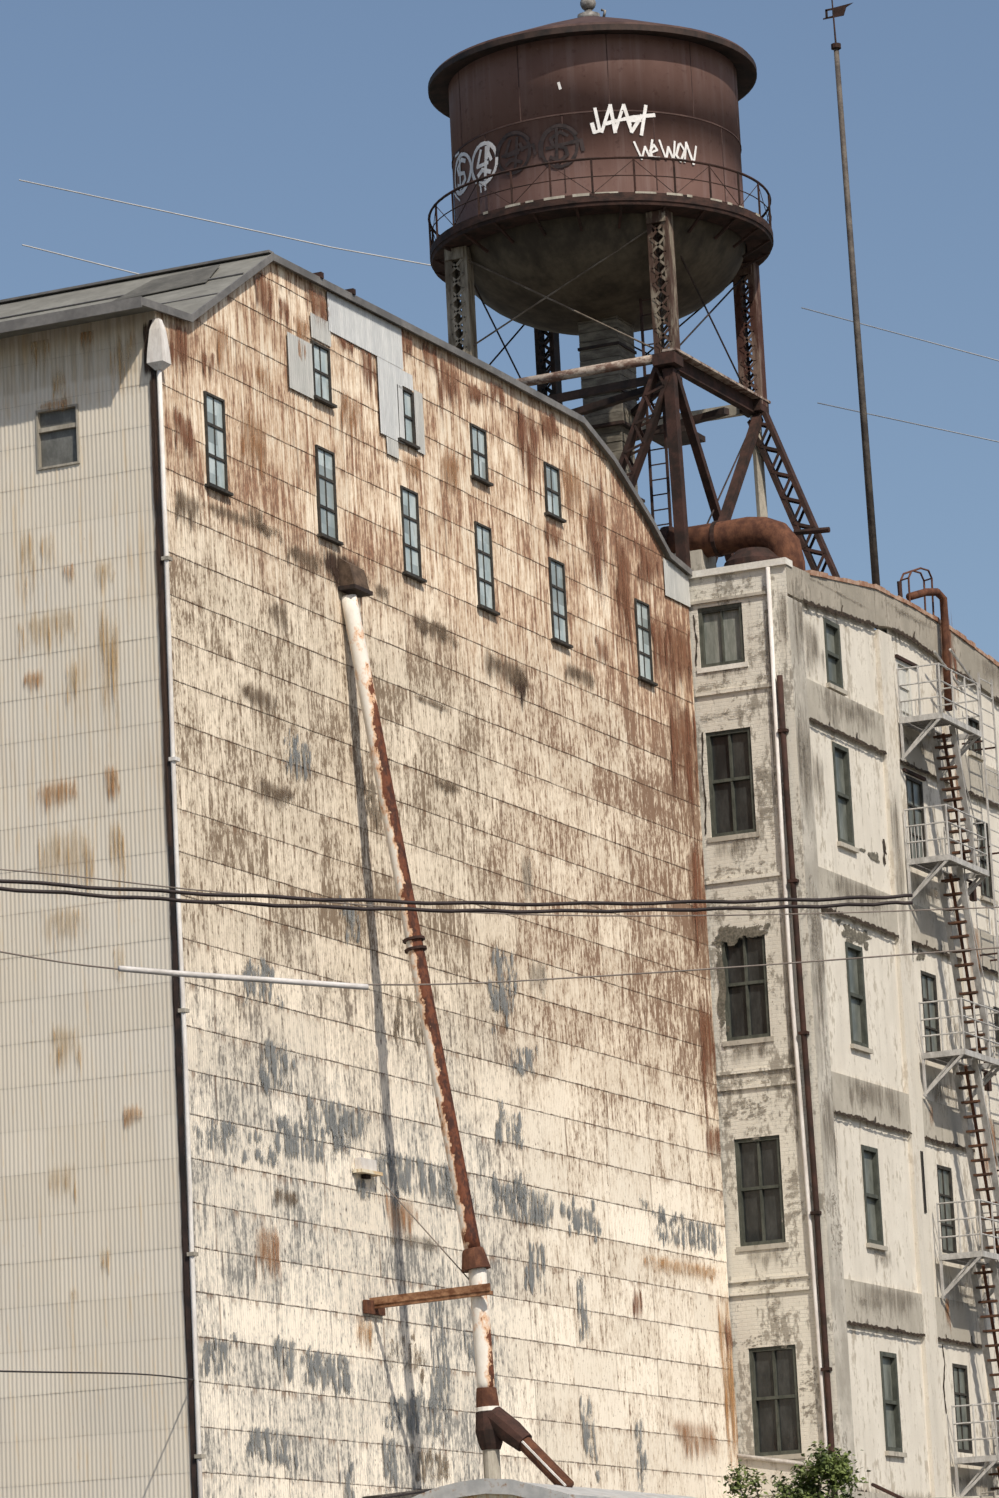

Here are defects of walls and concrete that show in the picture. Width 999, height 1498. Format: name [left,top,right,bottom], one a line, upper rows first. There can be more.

corrosion [255,274,329,358]
corrosion [401,333,559,491]
water stain [176,490,388,599]
corrosion [563,461,659,668]
water stain [415,614,457,646]
water stain [486,655,529,707]
water stain [565,664,594,688]
peeling [693,609,768,729]
corrosion [650,617,707,952]
spalling [705,861,778,1049]
peeling [716,1070,785,1140]
spalling [733,1279,809,1348]